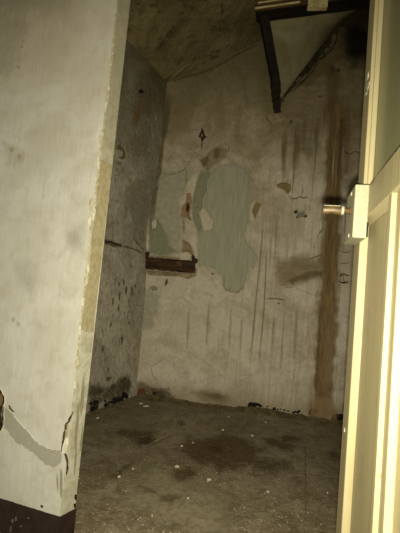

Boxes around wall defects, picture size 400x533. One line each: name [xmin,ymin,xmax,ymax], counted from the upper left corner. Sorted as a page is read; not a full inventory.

spalling [276,182,291,195]
crack [104,237,144,254]
peeling [147,165,262,293]
spalling [0,388,14,430]
crack [46,412,73,475]
damp [74,377,131,474]